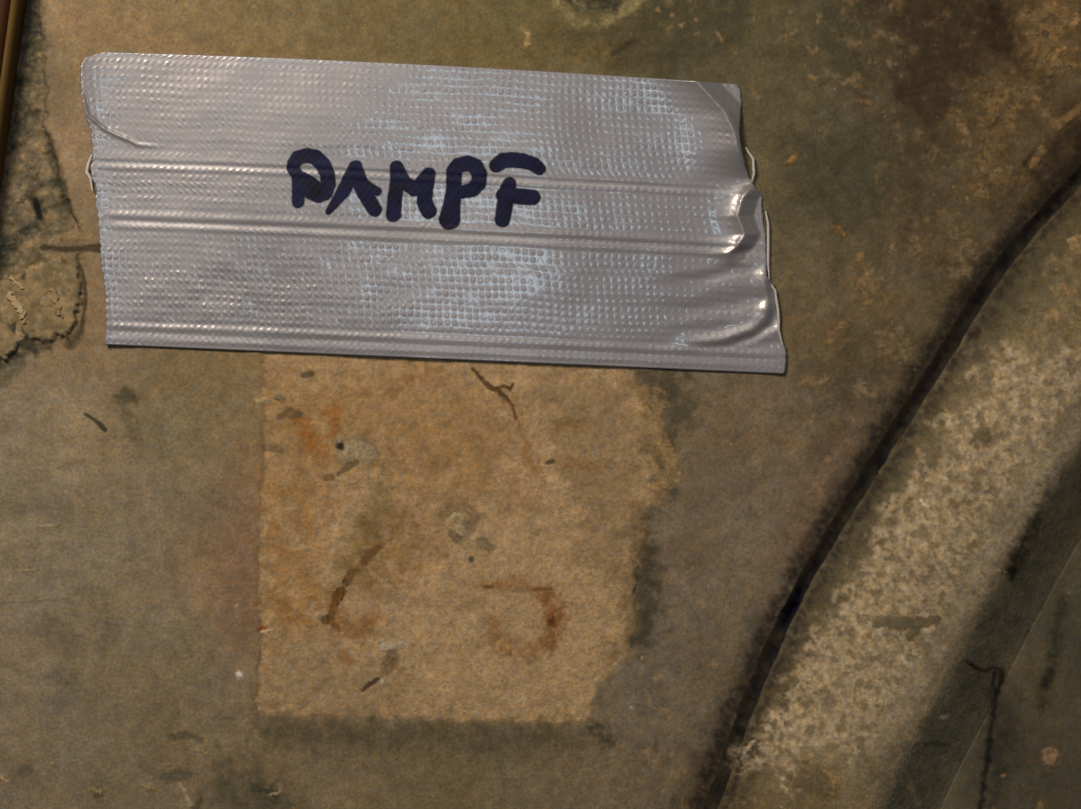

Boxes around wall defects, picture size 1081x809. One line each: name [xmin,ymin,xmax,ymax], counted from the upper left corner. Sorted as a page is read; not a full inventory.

spalling [0,0,80,280]
corrosion [493,578,563,656]